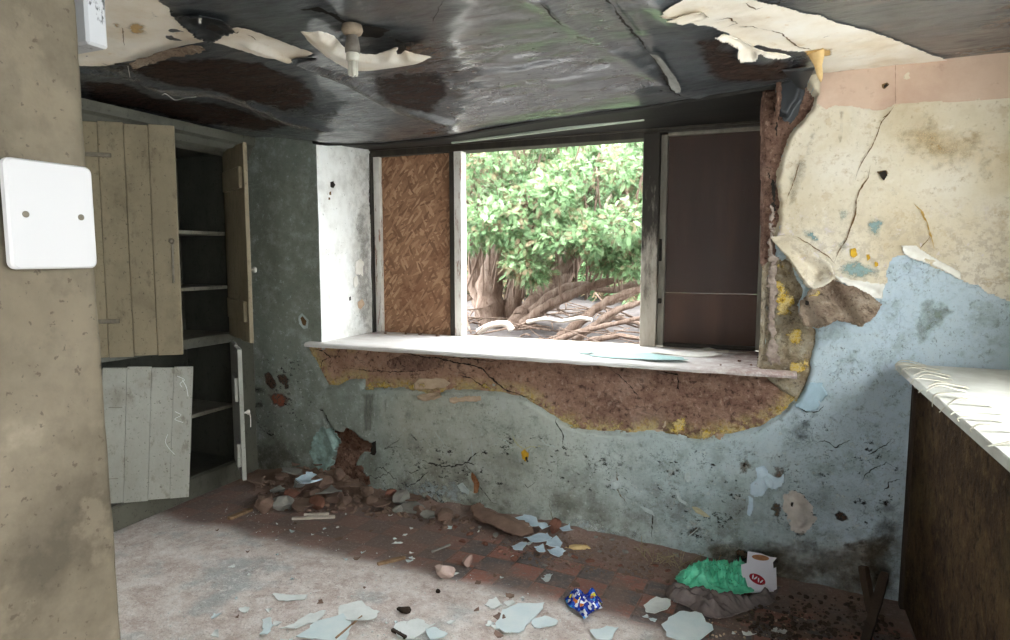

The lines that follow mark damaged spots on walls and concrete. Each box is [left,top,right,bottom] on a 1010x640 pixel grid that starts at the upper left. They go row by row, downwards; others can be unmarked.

peeling [78,0,431,71]
damp [84,59,324,133]
crack [798,65,896,260]
flaking render [256,0,1010,560]
damp [711,523,894,588]